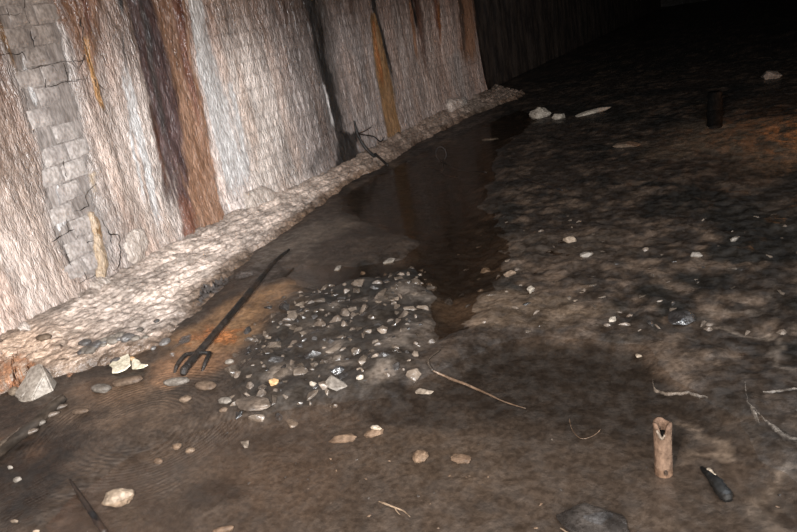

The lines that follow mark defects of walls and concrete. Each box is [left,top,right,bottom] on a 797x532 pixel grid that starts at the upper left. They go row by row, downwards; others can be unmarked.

rust [0,22,15,66]
rust [151,0,225,237]
rust [370,0,401,138]
crack [52,184,121,283]